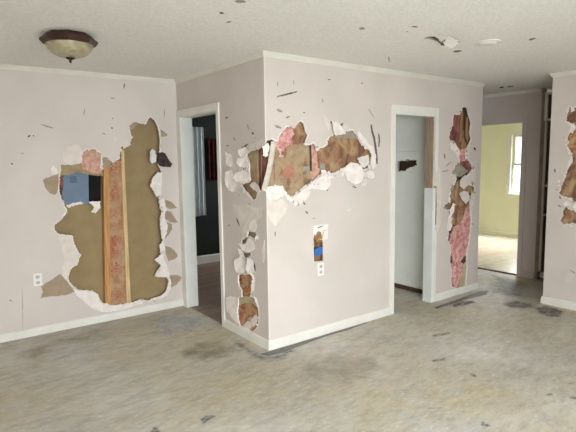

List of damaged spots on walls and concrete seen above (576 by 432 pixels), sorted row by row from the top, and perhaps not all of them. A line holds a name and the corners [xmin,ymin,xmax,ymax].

spalling [51,117,172,312]
spalling [225,115,376,333]
crack [371,124,380,164]
spalling [396,159,417,172]
spalling [434,106,476,288]
spalling [556,105,576,227]